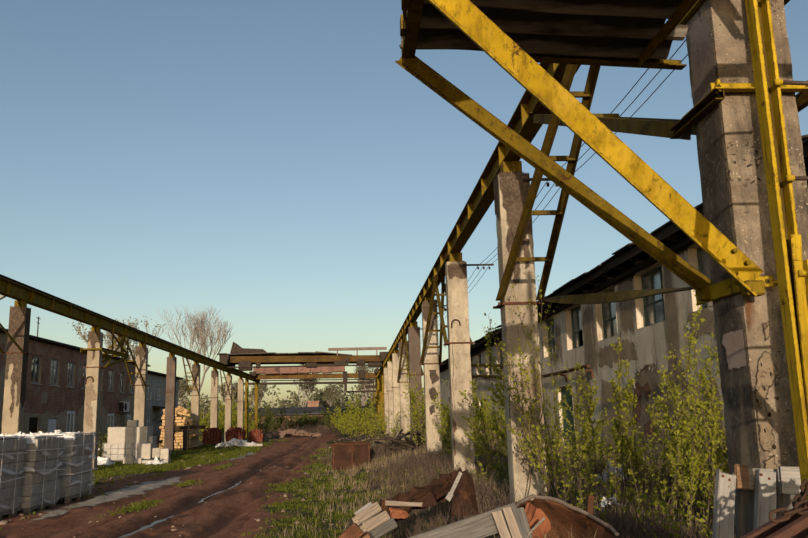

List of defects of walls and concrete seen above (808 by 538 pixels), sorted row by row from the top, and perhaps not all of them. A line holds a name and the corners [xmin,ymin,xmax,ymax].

damp [493,171,533,285]
damp [5,306,31,417]
damp [85,378,97,459]
damp [88,331,100,360]
peeling [598,280,727,461]